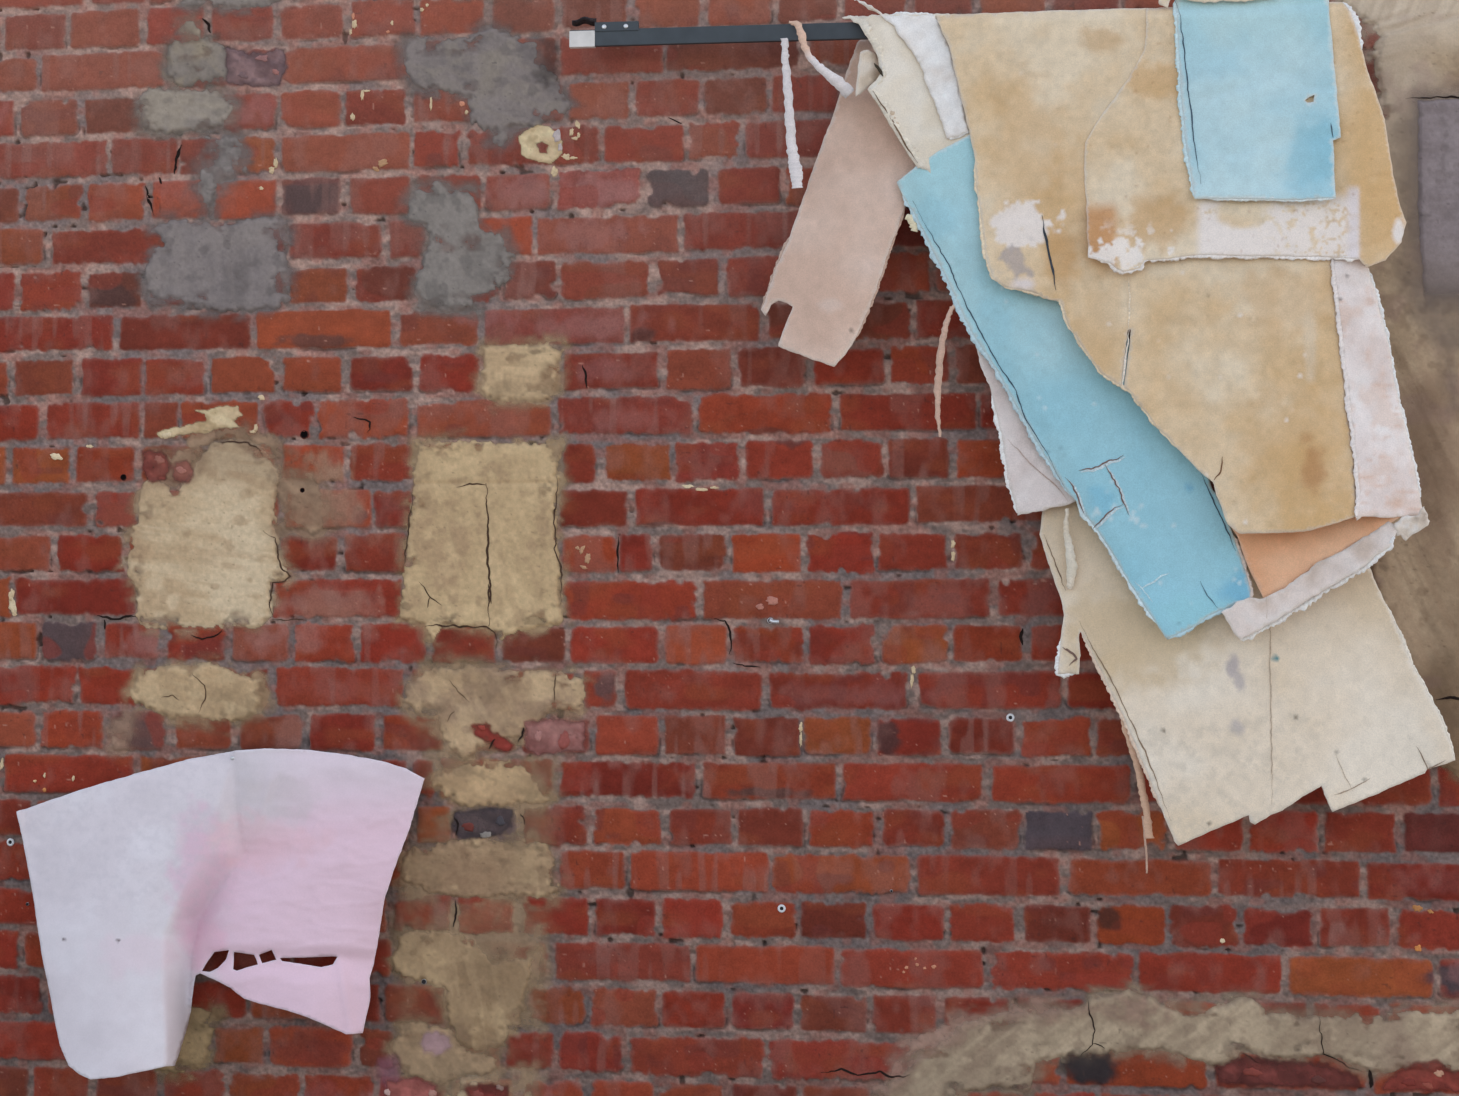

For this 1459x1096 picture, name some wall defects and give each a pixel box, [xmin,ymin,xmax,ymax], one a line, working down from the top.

peeling [142,405,258,483]
spalling [1394,507,1430,541]
crack [402,483,497,646]
spalling [471,719,585,756]
spalling [452,808,513,839]
spalling [384,1078,437,1096]
spalling [466,1084,508,1096]
spalling [1214,1057,1360,1088]
spalling [1382,1060,1459,1092]